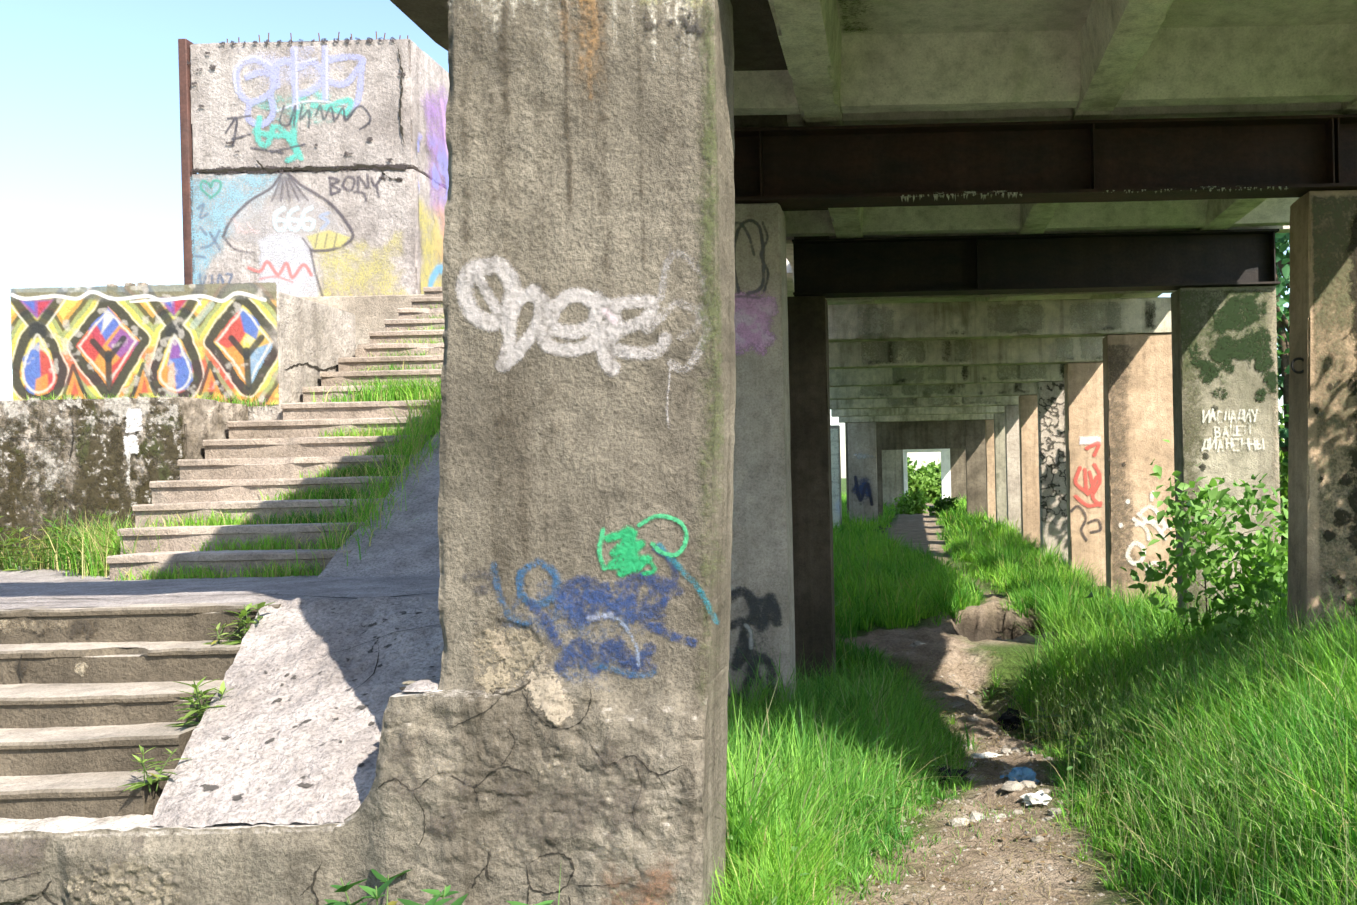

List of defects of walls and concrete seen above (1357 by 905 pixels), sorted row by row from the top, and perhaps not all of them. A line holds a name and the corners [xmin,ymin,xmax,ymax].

damp [490,0,514,115]
damp [561,0,572,211]
damp [637,0,724,515]
damp [0,396,182,530]
damp [1180,288,1280,555]
damp [1312,196,1357,637]
peeling [473,626,576,727]
crack [375,660,682,888]
crack [0,871,58,905]
crack [295,862,322,905]
crack [526,852,636,905]